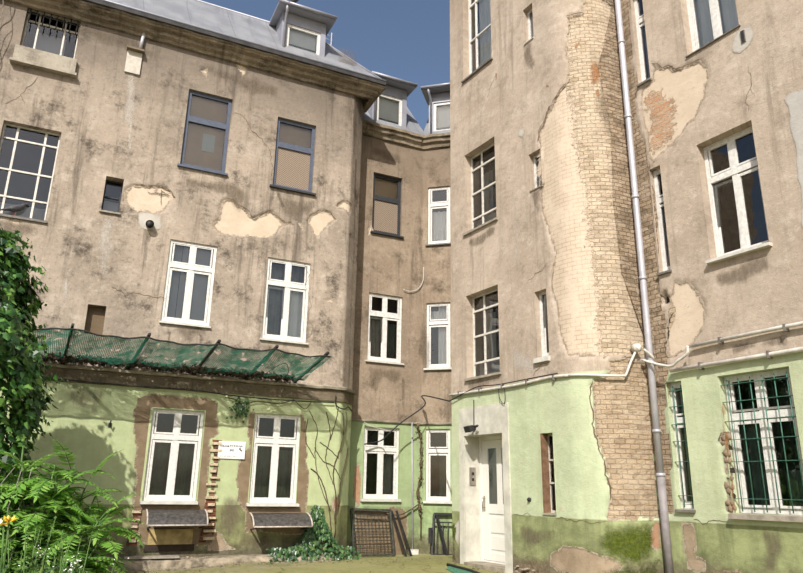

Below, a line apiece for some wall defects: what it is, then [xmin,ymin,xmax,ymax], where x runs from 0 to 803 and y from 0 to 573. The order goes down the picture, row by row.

flaking render [124,184,175,214]
flaking render [214,198,351,238]
flaking render [539,0,709,552]
leakage [518,560,549,573]
flaking render [550,545,623,573]
flaking render [681,522,706,573]